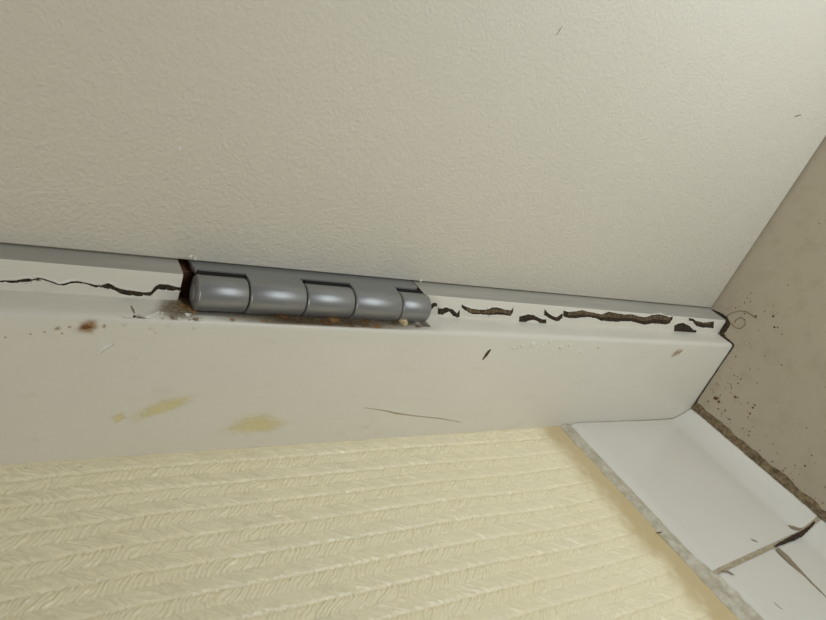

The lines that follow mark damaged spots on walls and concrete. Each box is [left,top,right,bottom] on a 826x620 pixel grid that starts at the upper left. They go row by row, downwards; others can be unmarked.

crack [0,275,181,298]
corrosion [163,297,196,316]
corrosion [247,315,398,329]
crack [431,301,714,329]